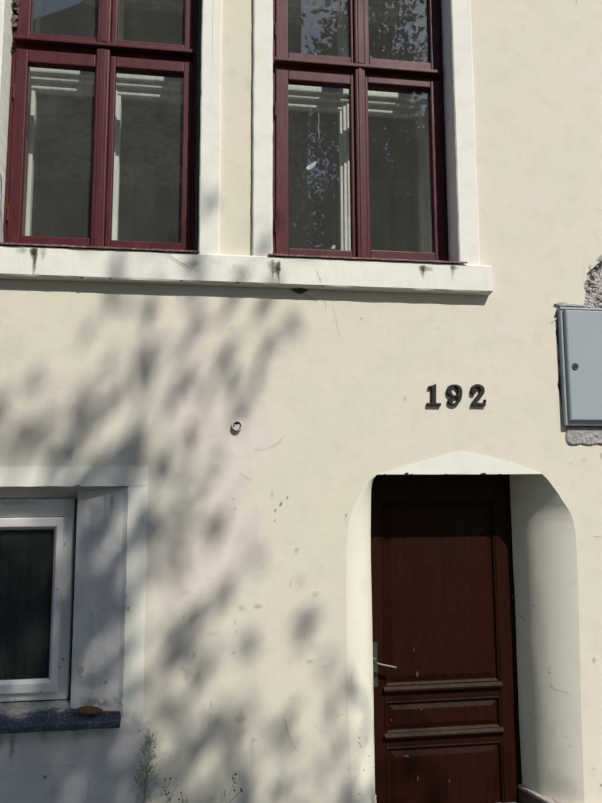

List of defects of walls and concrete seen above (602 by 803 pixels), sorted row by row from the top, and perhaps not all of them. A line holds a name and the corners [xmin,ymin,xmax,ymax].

spalling [554,261,602,308]